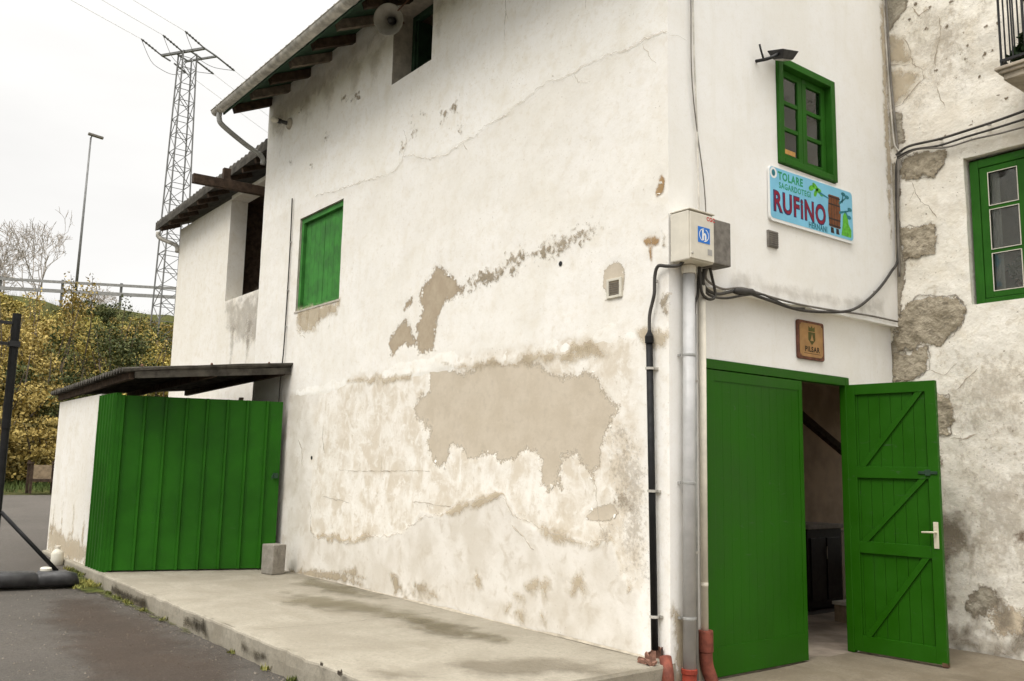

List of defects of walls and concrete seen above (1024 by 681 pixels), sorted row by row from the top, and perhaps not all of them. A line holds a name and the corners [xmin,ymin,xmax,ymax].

crack [315,31,682,197]
spalling [656,175,665,195]
flaking render [889,111,967,382]
flaking render [389,265,464,356]
flaking render [414,355,619,493]
flaking render [586,504,618,522]
spalling [960,586,1024,641]